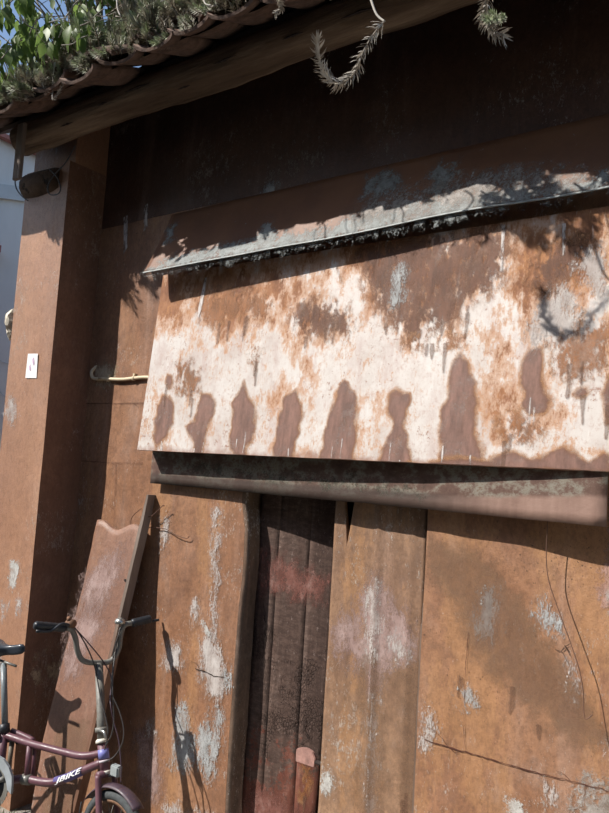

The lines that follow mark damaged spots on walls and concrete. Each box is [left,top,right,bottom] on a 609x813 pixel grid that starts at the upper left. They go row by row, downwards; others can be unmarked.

peeling [143,156,609,279]
corrosion [192,284,274,341]
corrosion [288,294,356,348]
corrosion [355,224,609,471]
corrosion [152,360,215,452]
corrosion [229,348,259,454]
corrosion [272,390,303,457]
corrosion [319,380,358,459]
peeling [131,506,234,813]
peeling [502,796,528,813]
crack [424,729,609,799]
peeling [543,770,609,813]